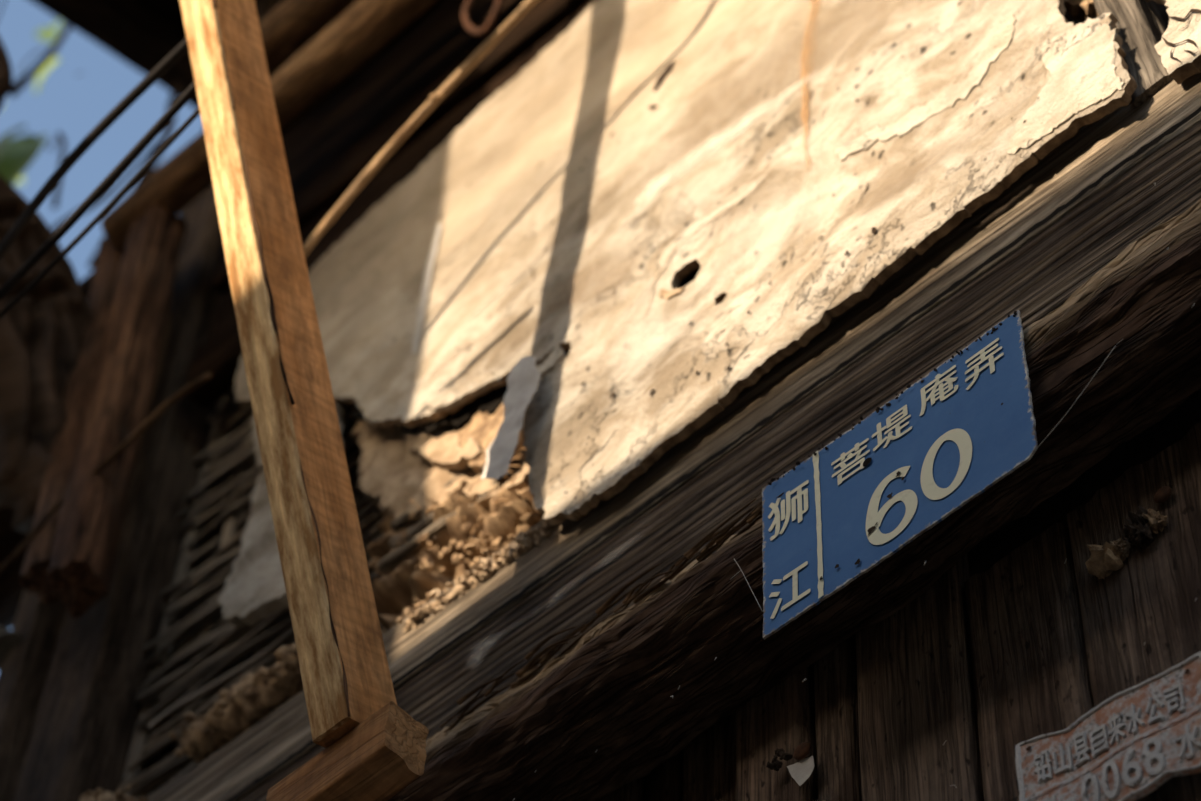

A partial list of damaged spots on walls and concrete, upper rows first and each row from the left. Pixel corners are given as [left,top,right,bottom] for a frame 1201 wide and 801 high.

peeling [536,345,566,381]
spalling [348,371,544,634]